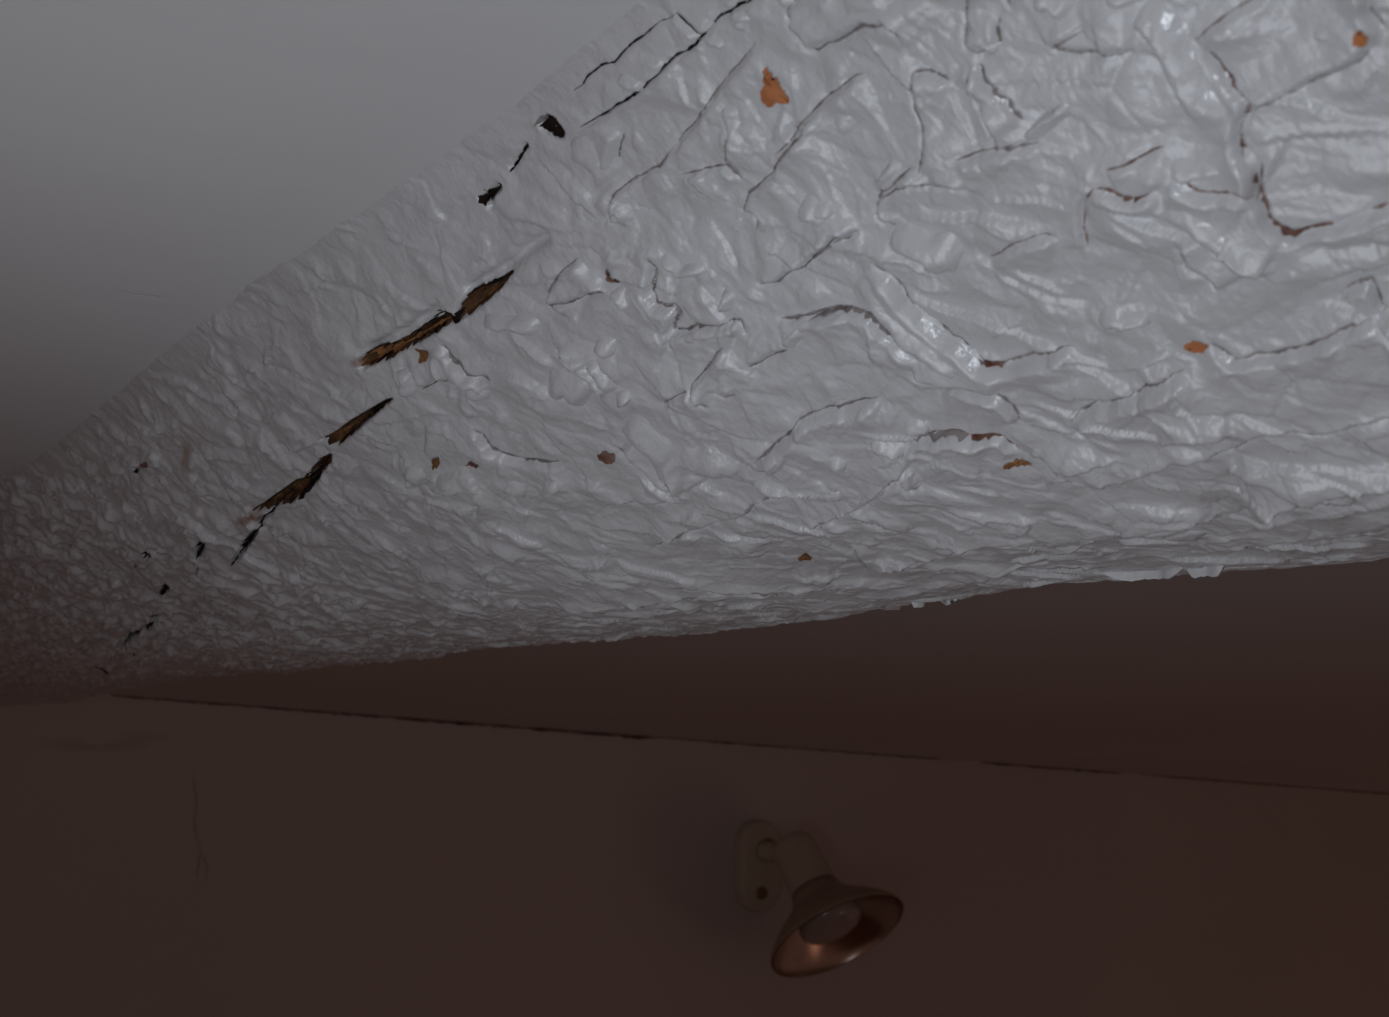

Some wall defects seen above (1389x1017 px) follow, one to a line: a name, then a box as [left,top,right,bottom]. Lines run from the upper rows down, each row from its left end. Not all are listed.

crack [814,24,898,51]
peeling [1351,30,1368,47]
crack [573,0,862,226]
peeling [760,68,789,108]
crack [877,0,1039,225]
crack [990,0,1388,257]
crack [478,143,529,208]
crack [759,232,855,284]
peeling [1184,341,1209,353]
crack [96,257,1389,794]